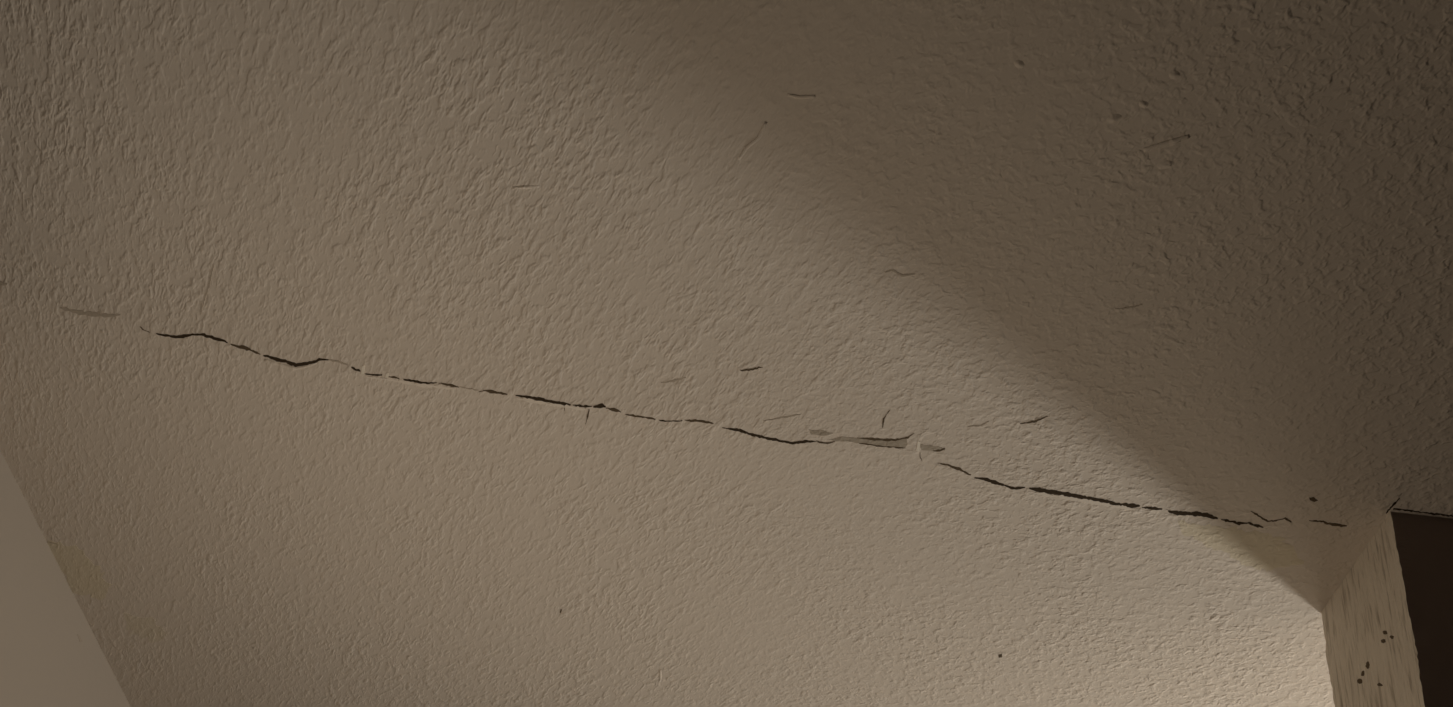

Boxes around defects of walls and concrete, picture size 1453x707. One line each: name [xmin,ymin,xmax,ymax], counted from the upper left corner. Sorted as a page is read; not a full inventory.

crack [60,264,1347,528]
crack [1386,498,1453,517]